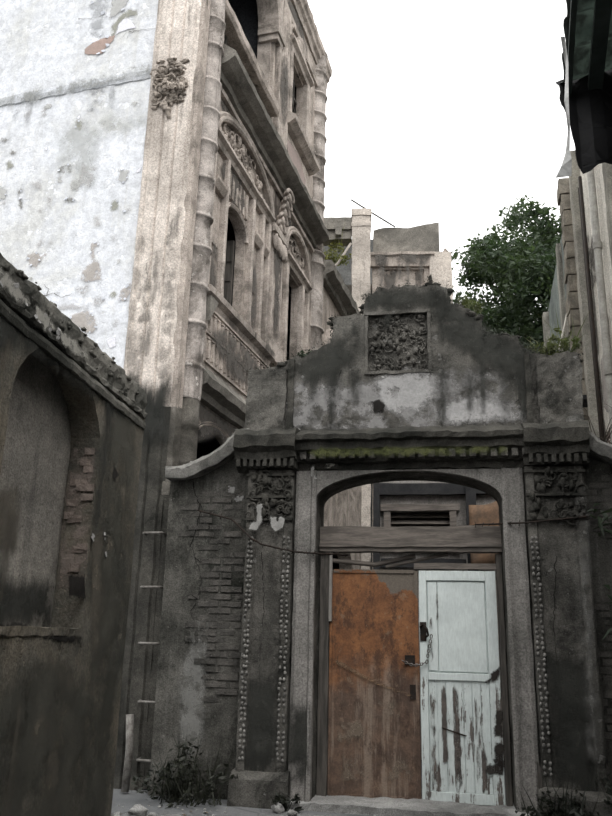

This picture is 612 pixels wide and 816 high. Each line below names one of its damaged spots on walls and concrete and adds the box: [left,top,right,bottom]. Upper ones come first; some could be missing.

spalling [85,0,128,55]
water stain [300,326,358,398]
water stain [366,254,532,418]
peeling [430,686,463,790]
peeling [474,700,505,793]